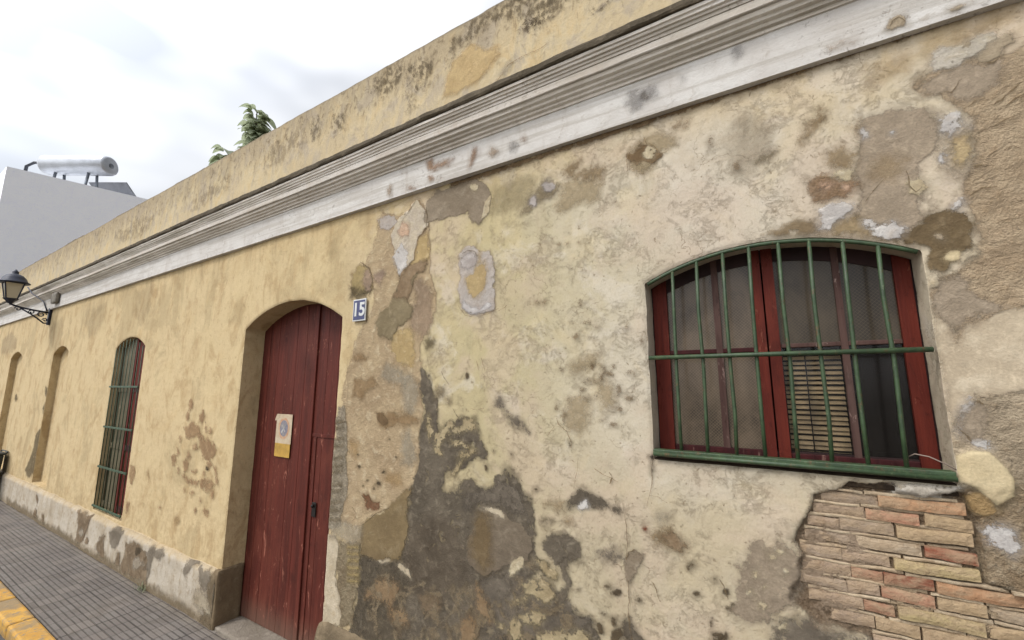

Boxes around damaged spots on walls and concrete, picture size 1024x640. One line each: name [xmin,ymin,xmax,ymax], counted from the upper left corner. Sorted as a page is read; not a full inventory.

peeling [886,14,906,30]
spalling [626,120,688,174]
spalling [808,32,1024,339]
peeling [457,245,507,317]
flaking render [323,200,437,626]
peeling [494,396,531,434]
peeling [554,356,633,432]
peeling [171,399,218,515]
spalling [543,489,621,523]
flaking render [713,392,1024,640]
water stain [7,499,215,629]
peeling [495,557,623,640]